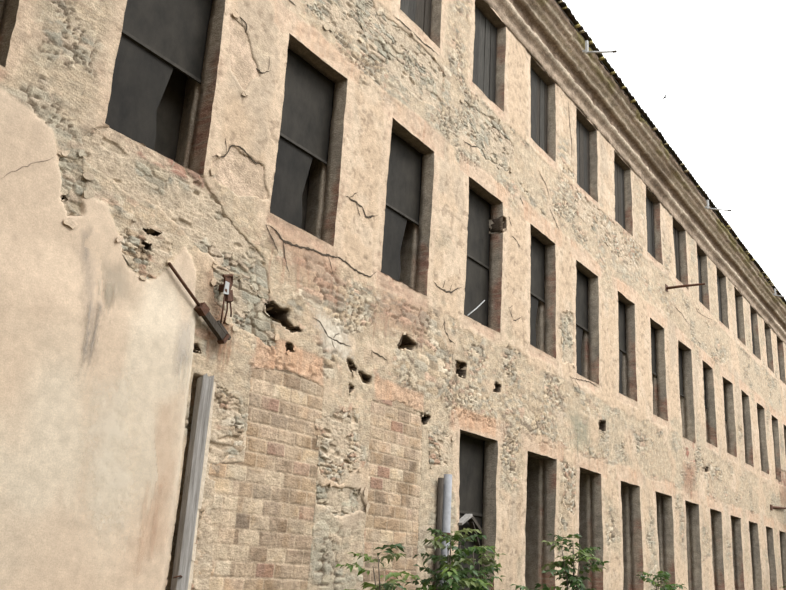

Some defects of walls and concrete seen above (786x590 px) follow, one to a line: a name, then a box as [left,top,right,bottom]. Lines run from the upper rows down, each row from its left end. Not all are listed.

spalling [305,0,381,42]
crack [213,141,264,165]
spalling [461,99,514,173]
crack [346,193,378,218]
spalling [57,127,280,349]
crack [266,225,376,278]
crack [314,318,349,348]